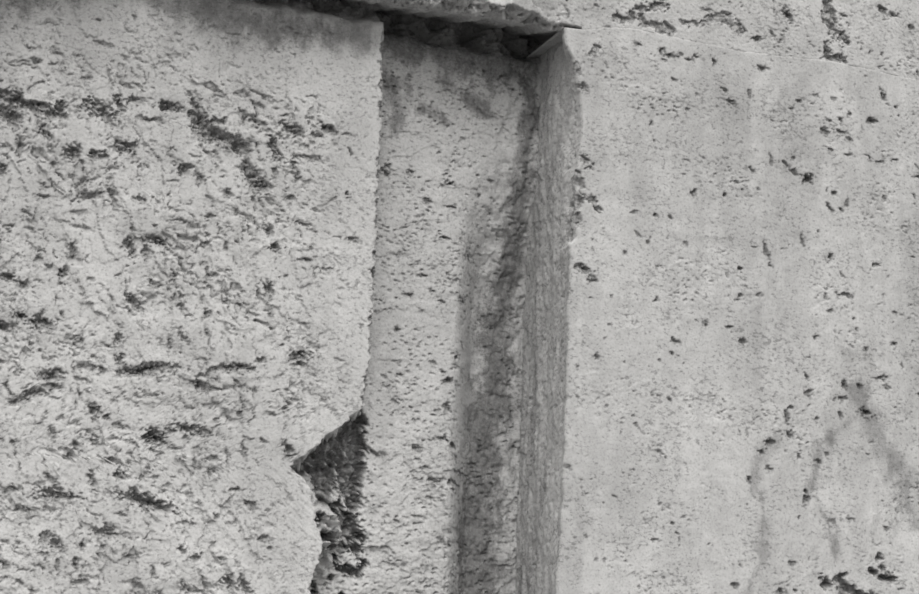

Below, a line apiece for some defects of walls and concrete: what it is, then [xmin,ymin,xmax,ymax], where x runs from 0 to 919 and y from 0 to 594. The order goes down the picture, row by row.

spalling [291,414,366,578]